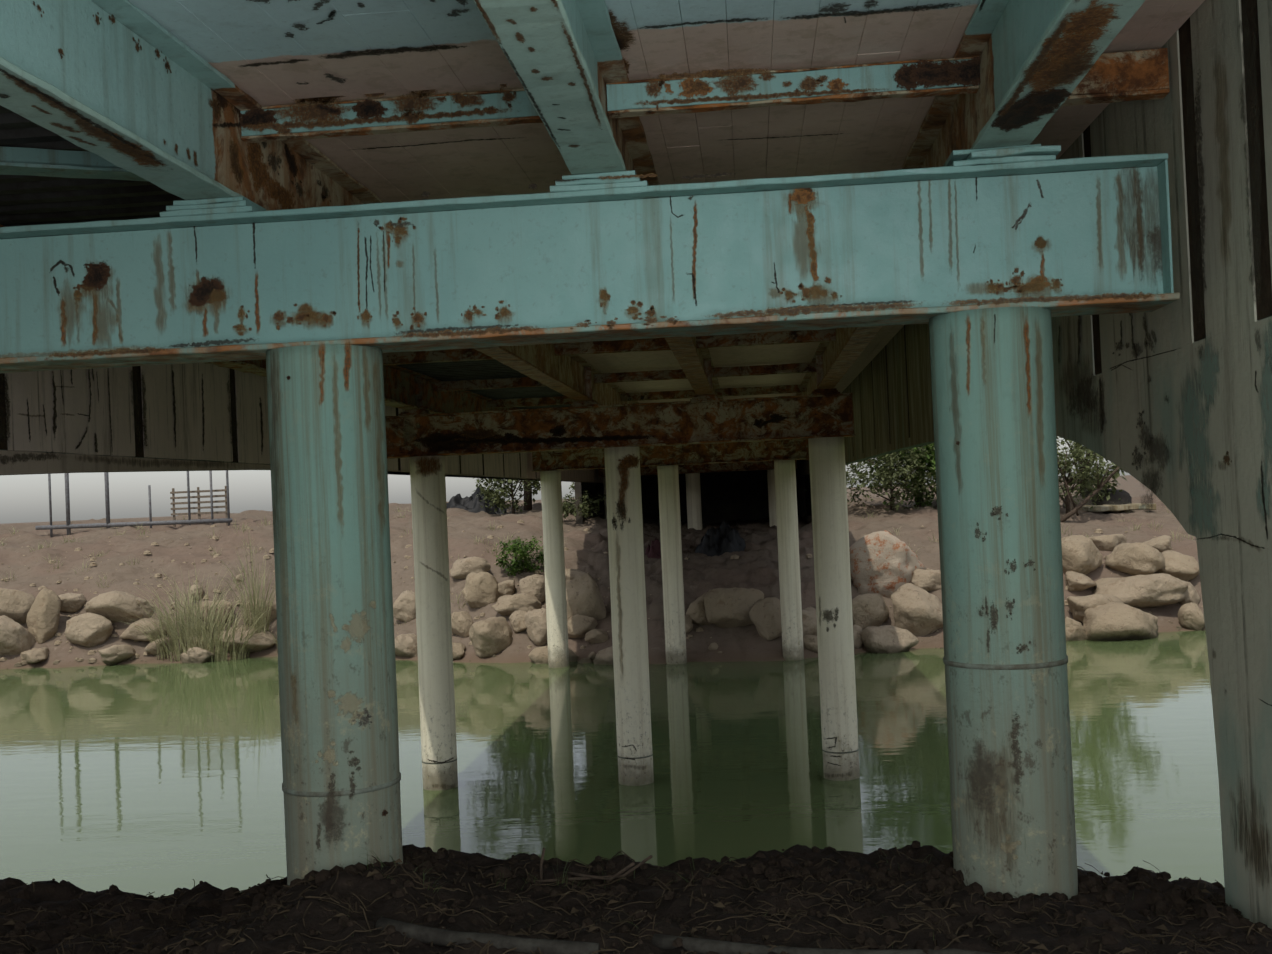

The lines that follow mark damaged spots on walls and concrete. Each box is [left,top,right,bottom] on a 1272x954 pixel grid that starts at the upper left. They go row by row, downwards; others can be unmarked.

rust [209,0,580,210]
rust [562,22,601,124]
rust [637,57,981,110]
rust [990,0,1120,133]
water stain [1239,19,1262,301]
rust [709,188,920,319]
rust [49,260,257,358]
rust [274,304,336,330]
rust [943,237,1162,394]
water stain [0,376,58,464]
crack [1195,461,1269,549]
water stain [968,714,1024,812]